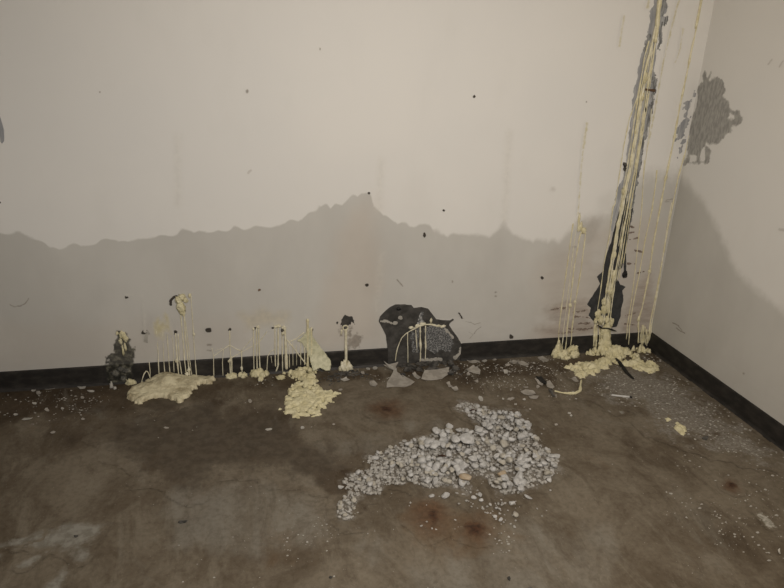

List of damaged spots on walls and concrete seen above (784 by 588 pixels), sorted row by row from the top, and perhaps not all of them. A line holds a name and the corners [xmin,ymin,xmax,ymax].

leakage [0,121,625,390]
flaking render [378,303,480,387]
peeling [587,0,669,328]
peeling [672,67,747,169]